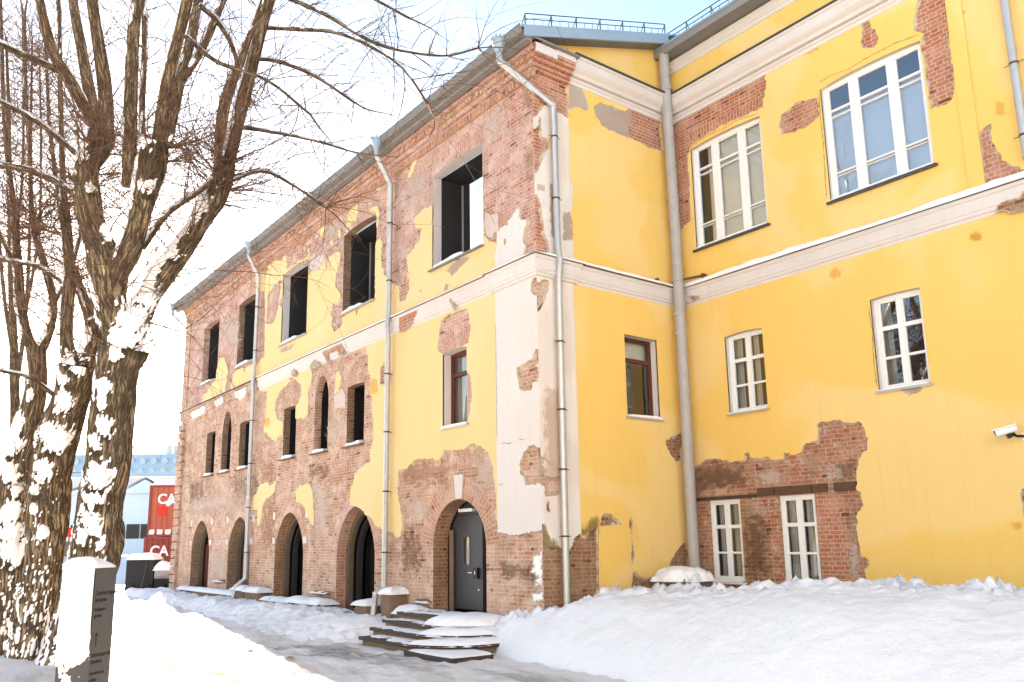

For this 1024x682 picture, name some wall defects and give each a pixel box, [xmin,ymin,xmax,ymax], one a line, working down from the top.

flaking render [535,42,576,63]
flaking render [860,20,879,49]
flaking render [913,0,955,109]
flaking render [779,97,820,135]
flaking render [979,124,1024,183]
flaking render [172,73,766,616]
flaking render [666,419,870,589]